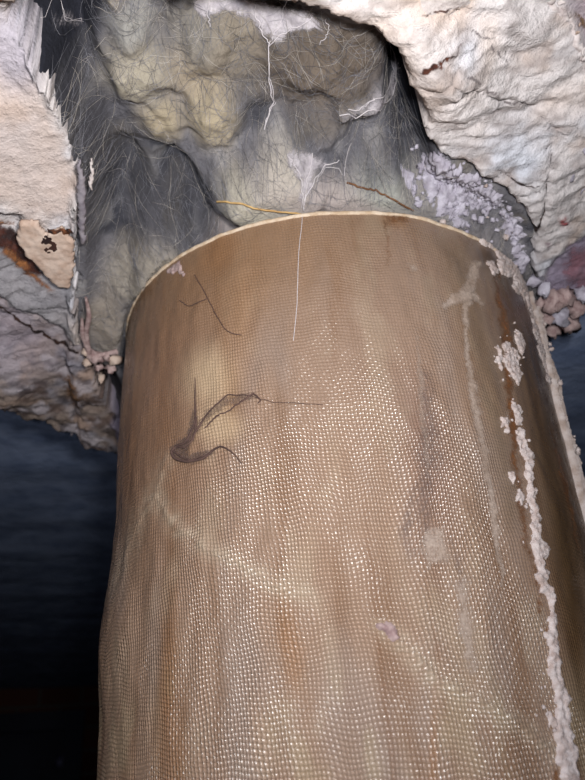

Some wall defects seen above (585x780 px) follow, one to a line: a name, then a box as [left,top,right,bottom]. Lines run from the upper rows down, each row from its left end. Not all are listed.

corrosion [0,221,48,288]
peeling [16,219,76,288]
crack [0,306,79,354]